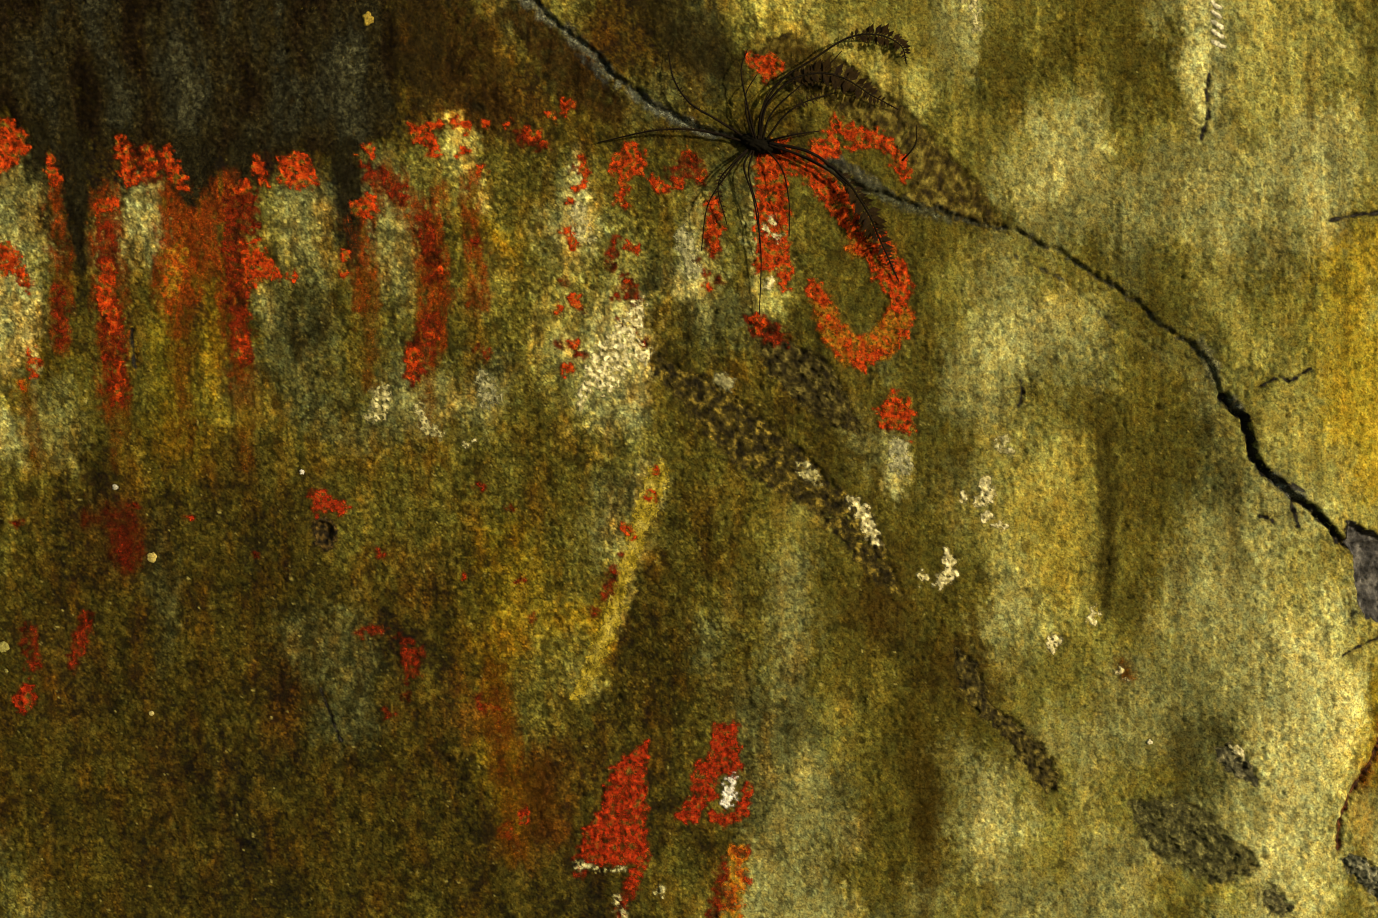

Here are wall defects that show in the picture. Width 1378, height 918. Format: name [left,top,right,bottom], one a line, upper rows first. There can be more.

water stain [0,0,622,273]
crack [521,0,737,139]
crack [1200,72,1211,141]
crack [1329,210,1378,222]
crack [821,155,1348,546]